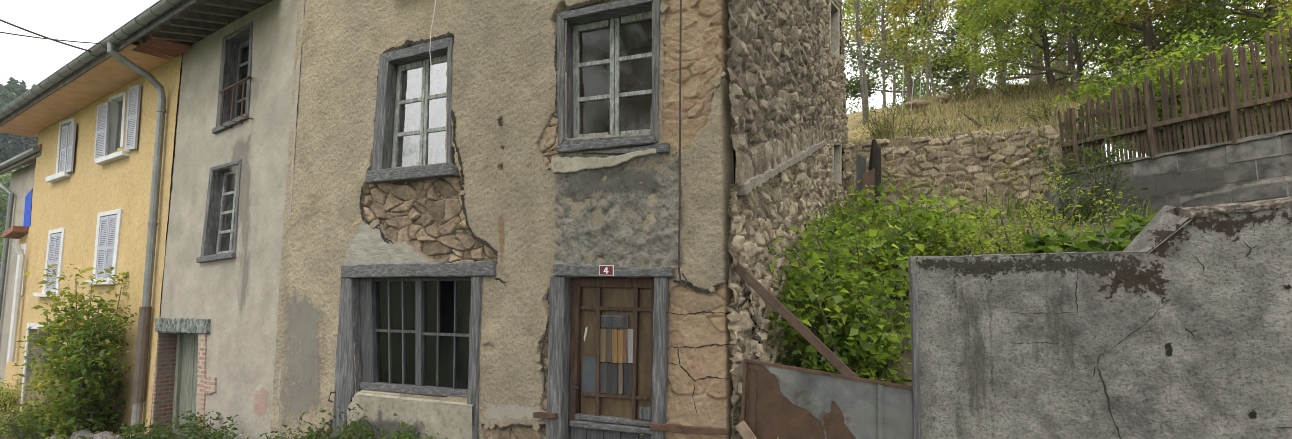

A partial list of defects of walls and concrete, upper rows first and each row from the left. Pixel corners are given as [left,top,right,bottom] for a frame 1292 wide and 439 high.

spalling [660,0,731,154]
spalling [362,163,498,263]
spalling [666,279,739,439]
corrosion [744,363,856,439]
crack [1093,302,1198,439]